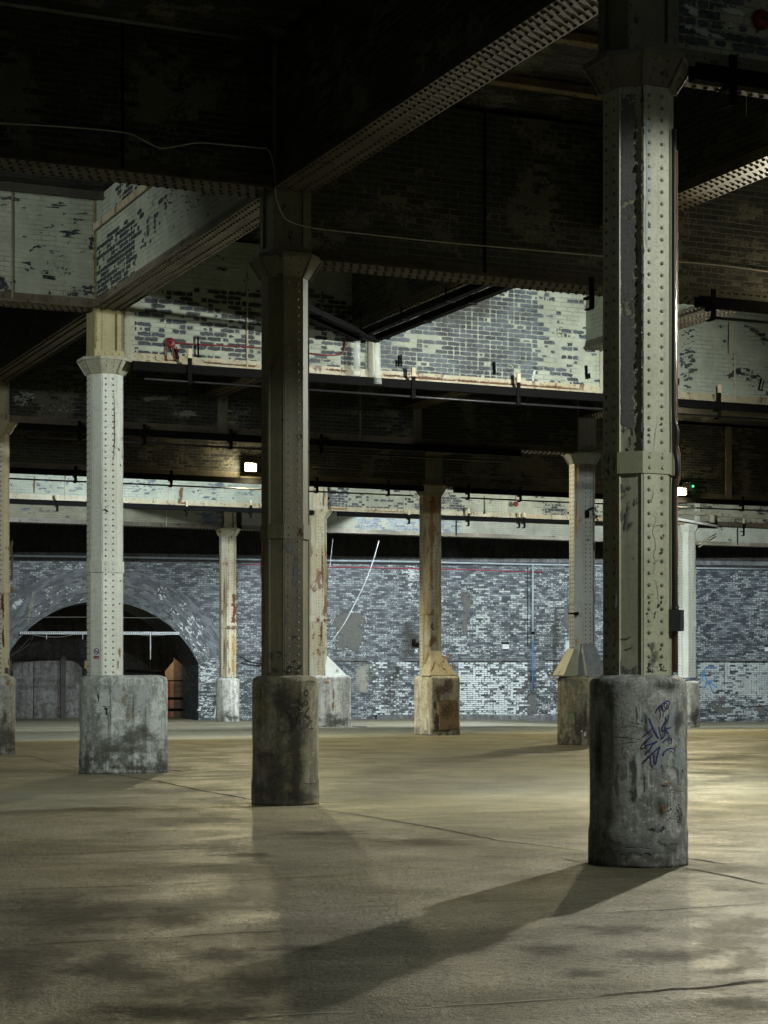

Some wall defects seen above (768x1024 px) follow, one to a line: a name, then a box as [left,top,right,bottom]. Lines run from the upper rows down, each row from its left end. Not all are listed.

peeling [22,190,217,298]
peeling [618,84,663,451]
peeling [679,329,698,388]
peeling [726,354,762,387]
rust [223,567,238,673]
damp [94,683,156,770]